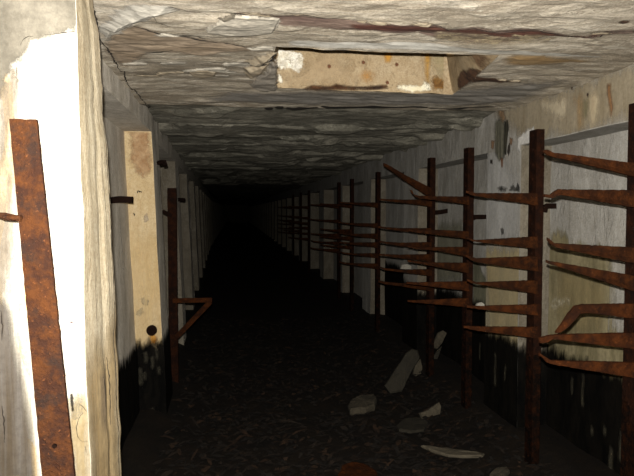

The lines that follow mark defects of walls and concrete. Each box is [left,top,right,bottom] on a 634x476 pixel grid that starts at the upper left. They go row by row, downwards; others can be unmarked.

flaking render [106,12,634,92]
leakage [216,67,634,167]
crack [87,4,160,476]
leakage [68,329,173,476]
leakage [540,231,623,475]